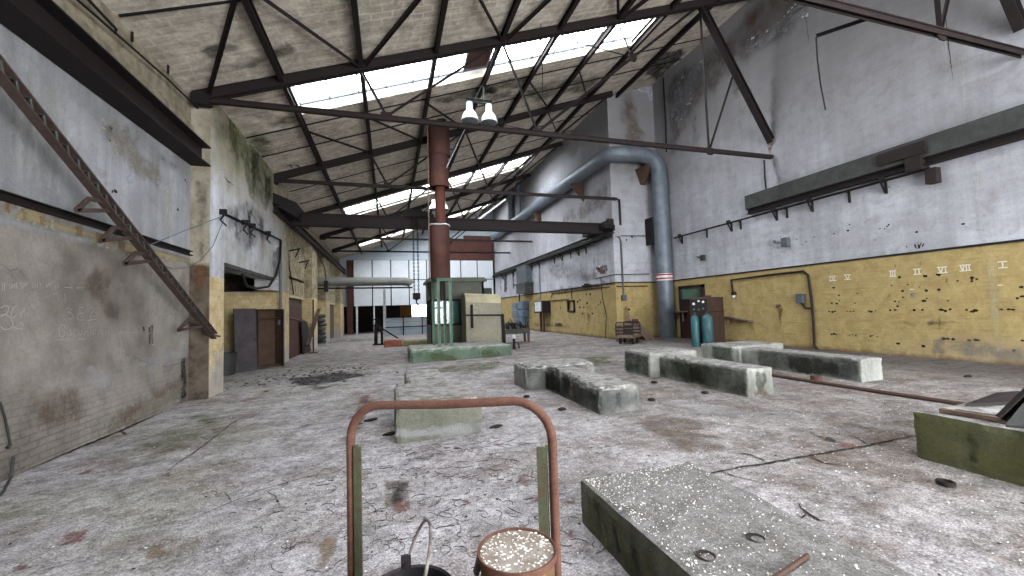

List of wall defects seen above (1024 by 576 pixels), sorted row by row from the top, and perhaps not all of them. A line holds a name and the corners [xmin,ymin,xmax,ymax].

crack [711,436,910,483]